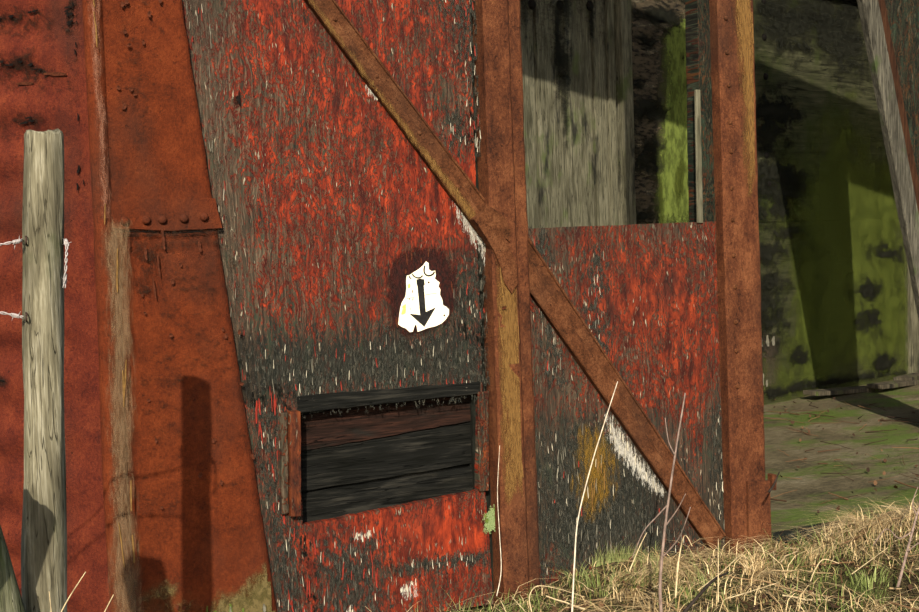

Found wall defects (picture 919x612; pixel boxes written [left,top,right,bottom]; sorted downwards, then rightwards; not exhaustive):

peeling [221,203,491,612]
corrosion [497,268,524,501]
water stain [521,0,595,144]
corrosion [579,430,615,513]
water stain [633,79,665,195]
water stain [633,0,679,54]
corrosion [736,0,755,193]
water stain [761,271,789,358]
water stain [756,102,807,262]
water stain [790,247,818,364]
water stain [835,127,904,370]